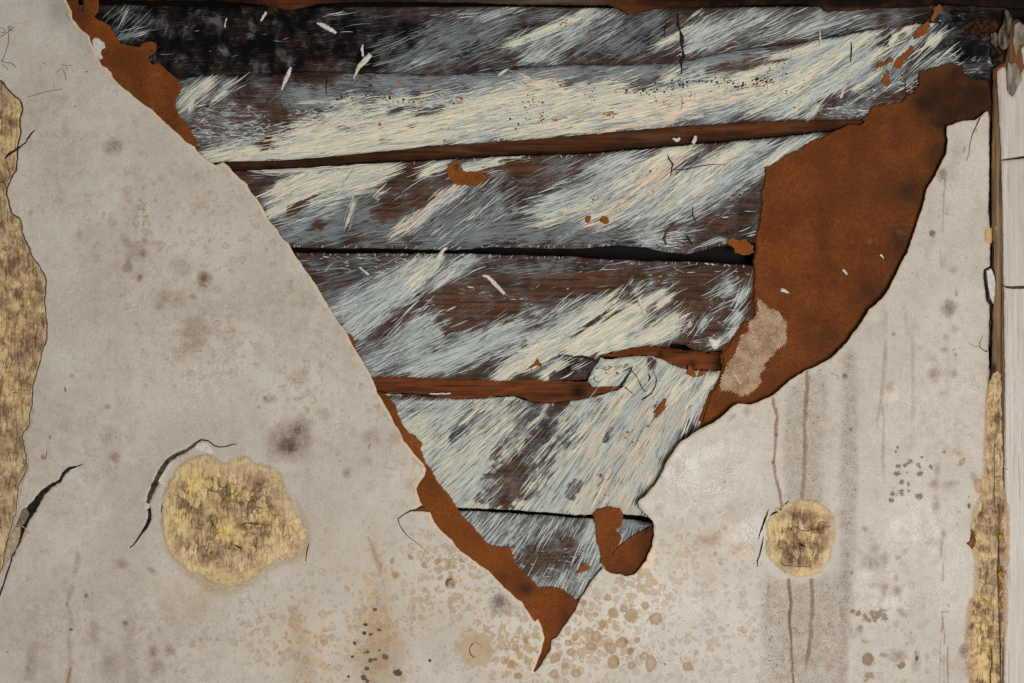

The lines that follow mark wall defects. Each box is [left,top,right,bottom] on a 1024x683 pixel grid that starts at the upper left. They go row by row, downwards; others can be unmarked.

peeling [92,38,112,76]
peeling [0,80,48,574]
peeling [719,297,787,397]
crack [0,451,83,596]
crack [129,439,236,548]
peeling [160,454,307,587]
peeling [765,499,835,578]
mould [347,623,388,683]
water stain [506,638,528,679]
water stain [550,594,662,679]